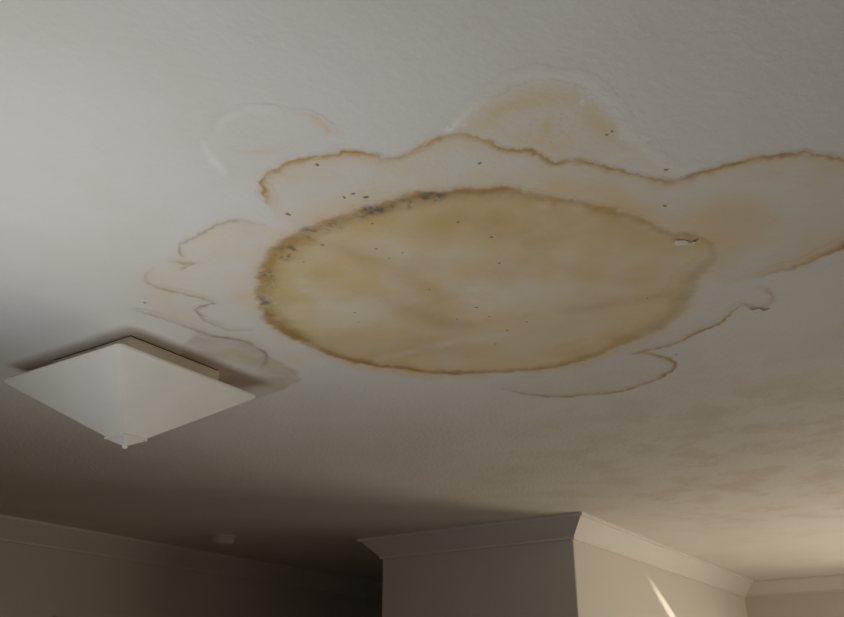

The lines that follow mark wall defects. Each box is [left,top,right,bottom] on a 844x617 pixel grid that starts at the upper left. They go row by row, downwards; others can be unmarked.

damp [130,63,844,402]